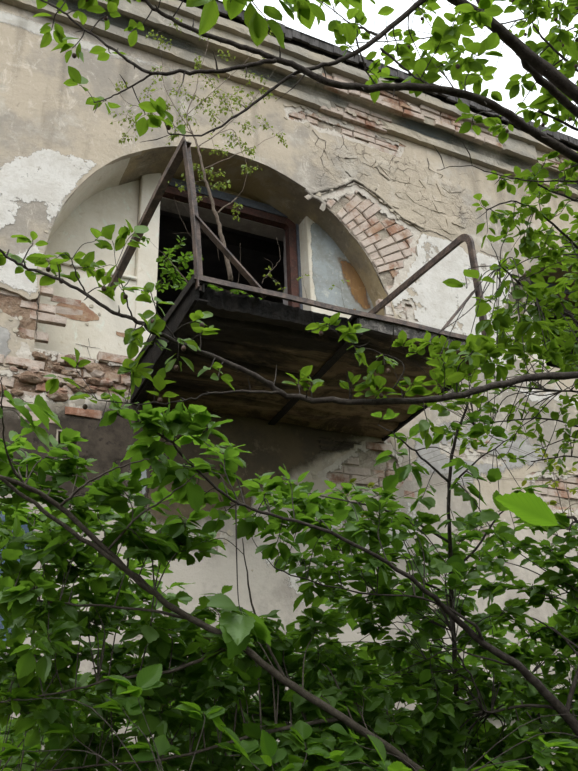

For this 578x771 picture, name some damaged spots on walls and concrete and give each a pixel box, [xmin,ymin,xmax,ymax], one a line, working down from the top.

crack [304,131,484,247]
peeling [283,73,516,368]
spalling [0,245,135,424]
spalling [525,462,578,518]